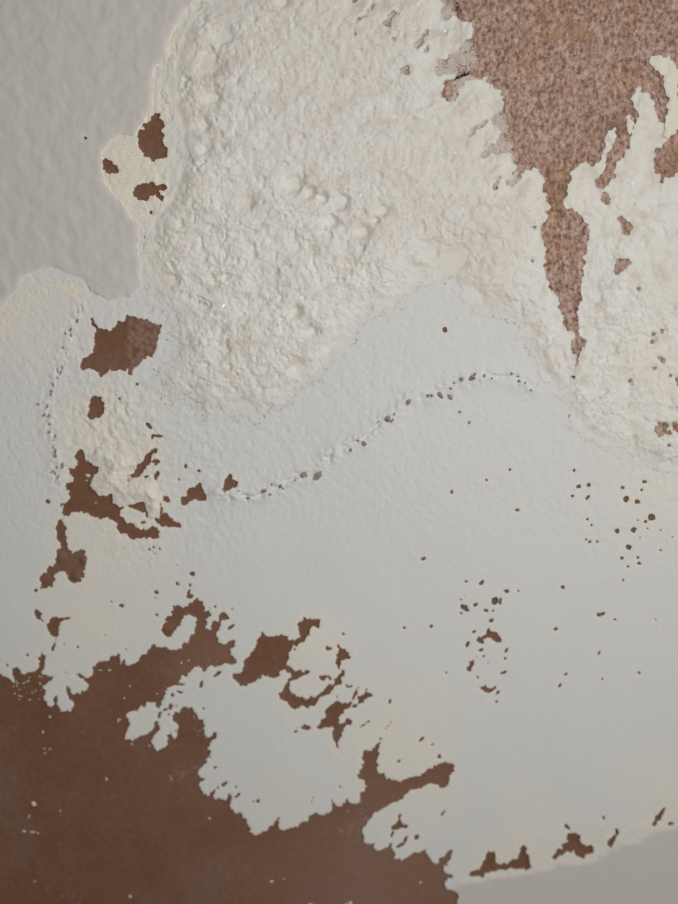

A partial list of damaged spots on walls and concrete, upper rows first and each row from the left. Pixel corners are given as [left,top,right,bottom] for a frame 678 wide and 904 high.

peeling [137,113,168,162]
peeling [103,158,119,175]
peeling [133,182,167,201]
flaking render [436,0,678,366]
peeling [80,315,162,377]
peeling [87,396,105,420]
peeling [60,448,160,540]
peeling [154,506,181,528]
peeling [39,519,87,589]
peeling [0,598,460,904]
peeling [469,845,531,877]
peeling [552,833,593,859]